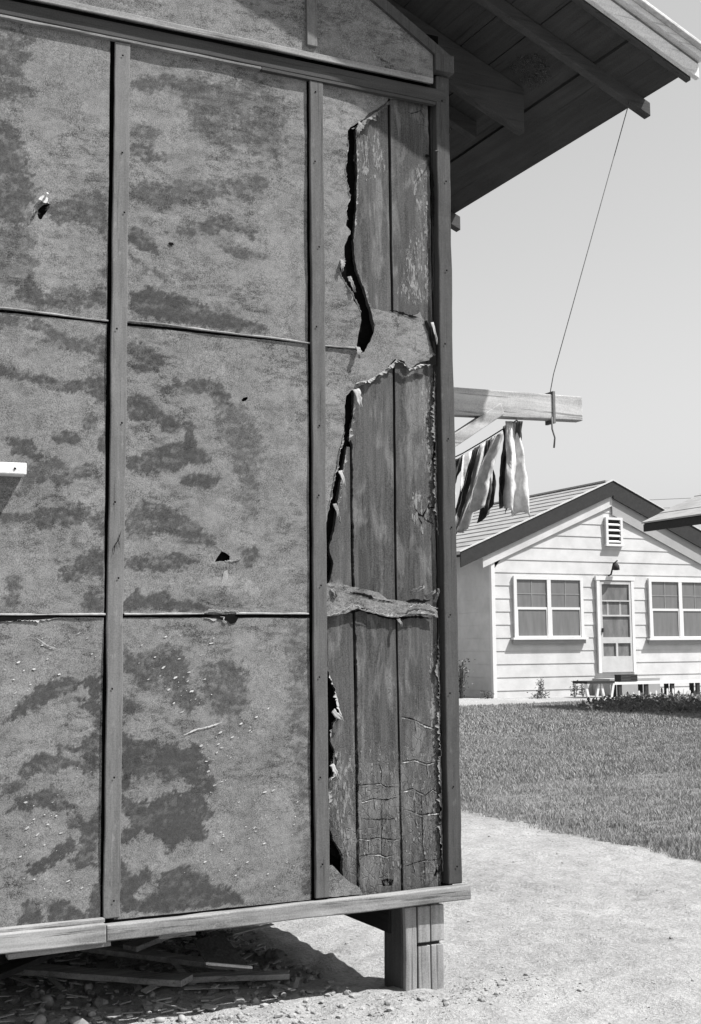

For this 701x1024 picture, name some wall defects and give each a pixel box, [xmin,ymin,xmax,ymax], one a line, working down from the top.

peeling [358,132,385,181]
peeling [397,164,431,304]
water stain [130,280,266,335]
water stain [126,393,219,488]
peeling [419,379,433,481]
peeling [412,492,435,534]
water stain [1,674,102,925]
water stain [121,729,217,854]
peeling [332,644,440,883]
crack [358,759,440,876]
crack [402,716,437,731]
water stain [120,862,244,914]